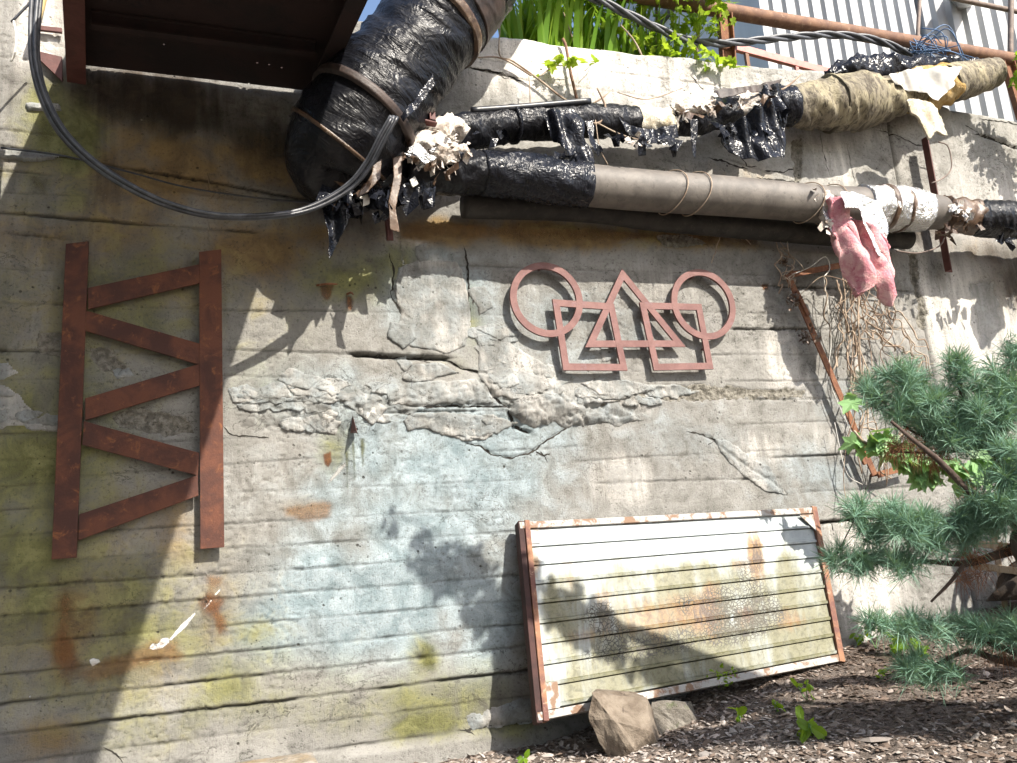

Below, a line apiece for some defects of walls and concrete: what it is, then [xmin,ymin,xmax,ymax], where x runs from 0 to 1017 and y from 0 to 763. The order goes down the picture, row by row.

crack [389,253,401,314]
crack [464,248,474,311]
peeling [228,243,805,441]
peeling [0,363,58,432]
damp [150,613,196,650]